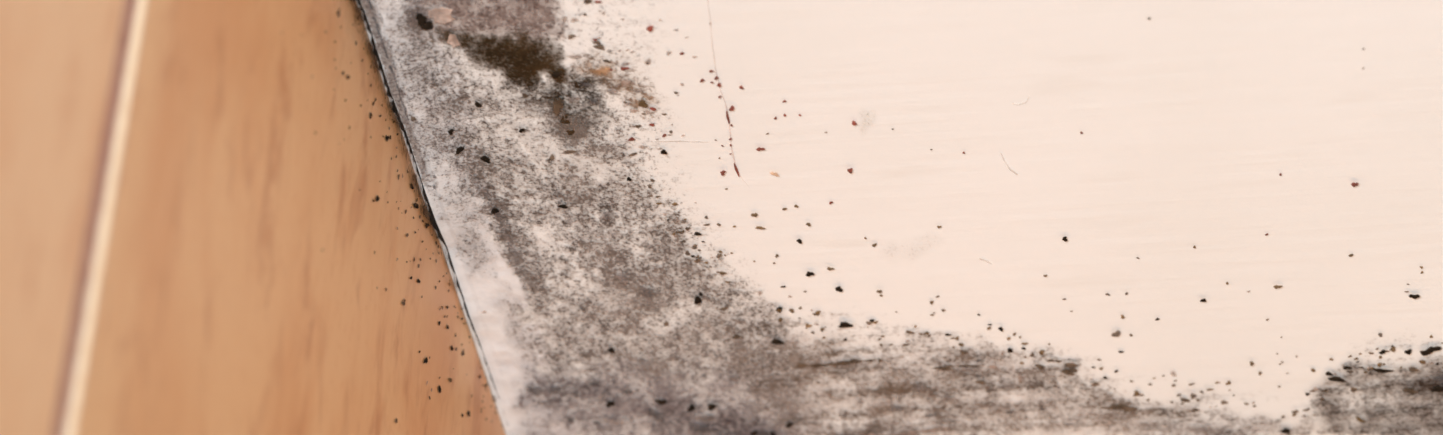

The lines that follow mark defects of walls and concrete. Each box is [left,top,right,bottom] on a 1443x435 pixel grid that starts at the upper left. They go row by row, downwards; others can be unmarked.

water stain [325,0,1443,435]